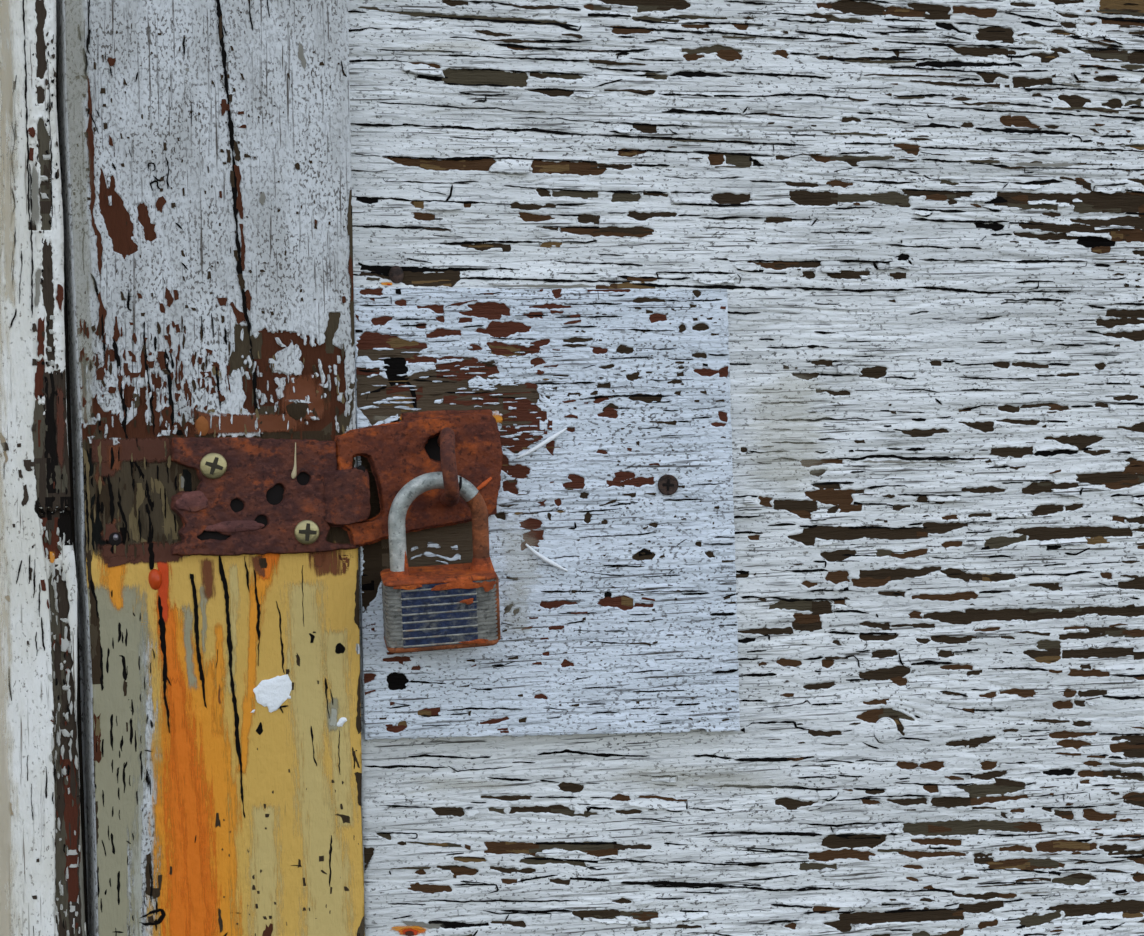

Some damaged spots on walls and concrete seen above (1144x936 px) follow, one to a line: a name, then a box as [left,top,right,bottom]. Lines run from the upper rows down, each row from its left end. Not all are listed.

peeling [613,117,948,168]
peeling [785,163,1144,347]
peeling [783,359,887,396]
peeling [993,361,1080,377]
crack [10,0,177,936]
corrosion [91,436,172,485]
corrosion [176,491,208,512]
peeling [1,0,756,936]
peeling [901,403,1111,470]
crack [6,667,14,701]
crack [190,556,304,818]
peeling [730,440,1144,936]